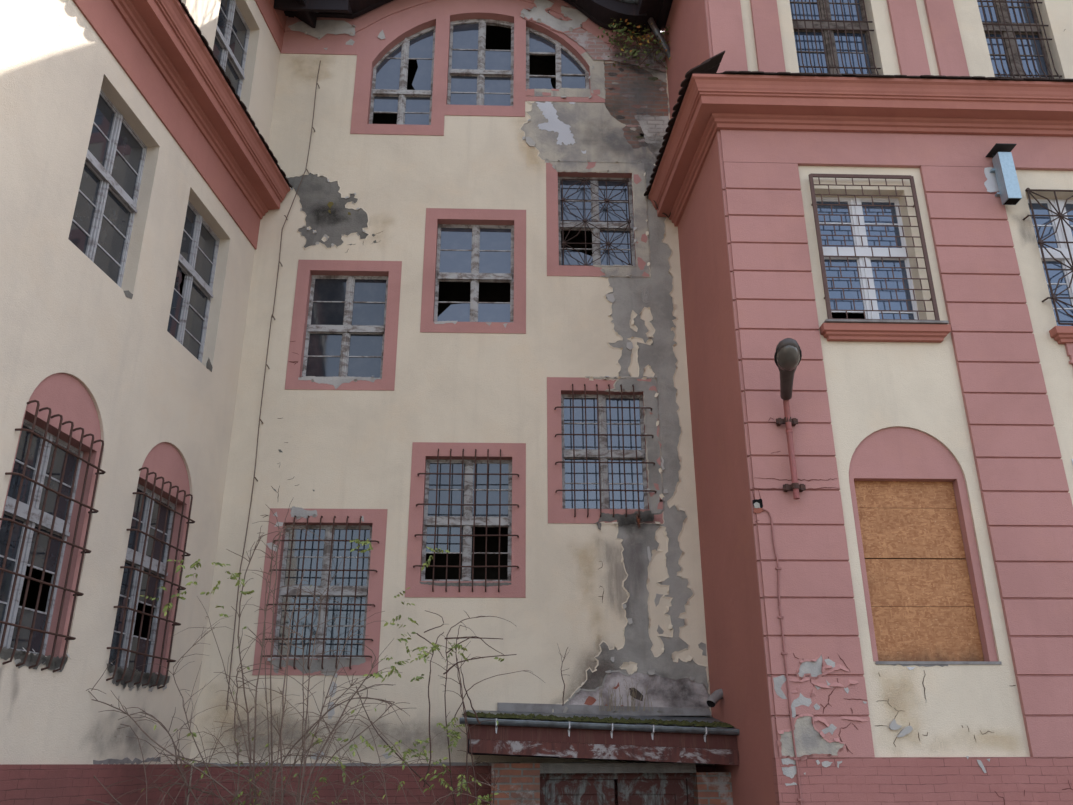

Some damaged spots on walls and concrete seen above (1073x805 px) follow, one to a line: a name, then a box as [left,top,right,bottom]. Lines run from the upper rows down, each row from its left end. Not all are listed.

peeling [286,172,383,253]
peeling [519,0,712,717]
spalling [752,499,764,513]
crack [752,451,837,523]
peeling [773,653,845,786]